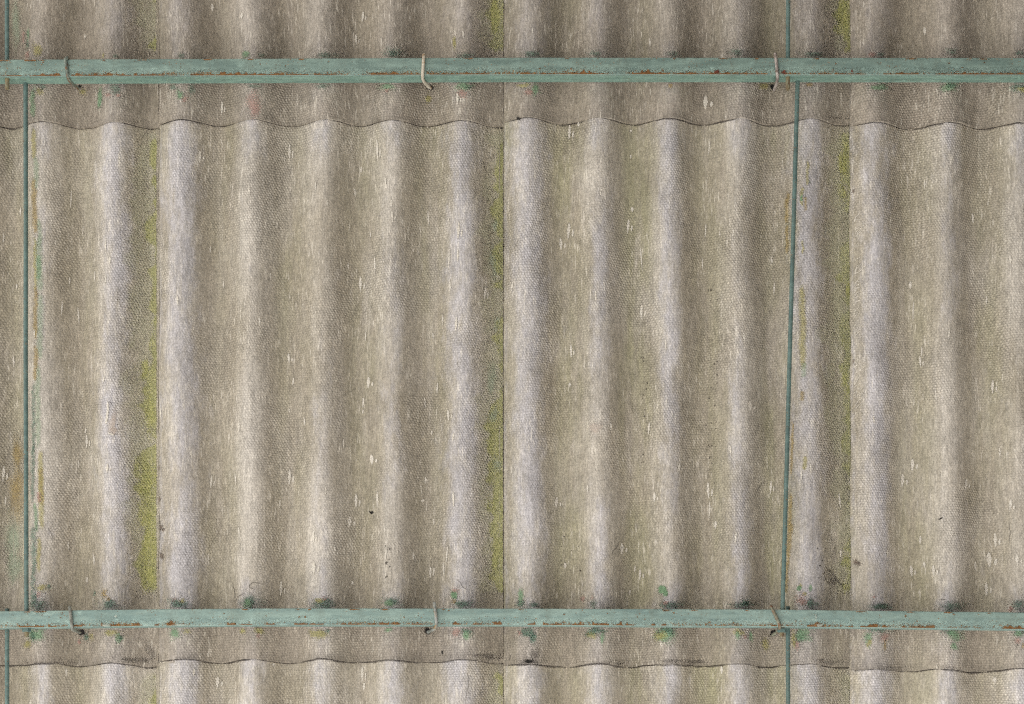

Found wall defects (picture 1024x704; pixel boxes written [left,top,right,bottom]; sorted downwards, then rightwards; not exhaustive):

rust [0,58,613,76]
rust [628,58,1024,74]
damp [974,533,1000,570]
rust [1,611,198,628]
rust [212,609,1024,629]